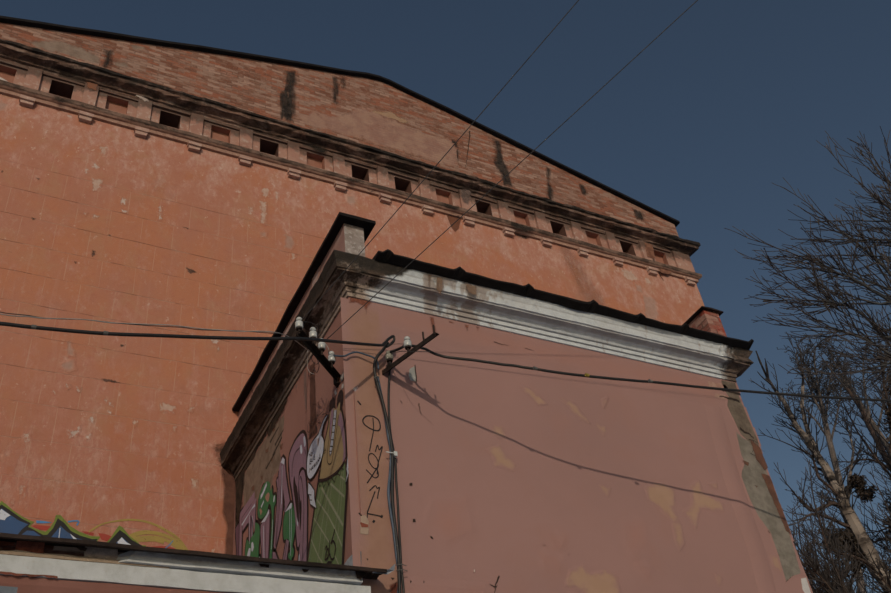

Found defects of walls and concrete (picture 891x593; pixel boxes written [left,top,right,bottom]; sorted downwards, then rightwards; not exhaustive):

spalling [242,407,286,515]
flaking render [340,297,812,593]